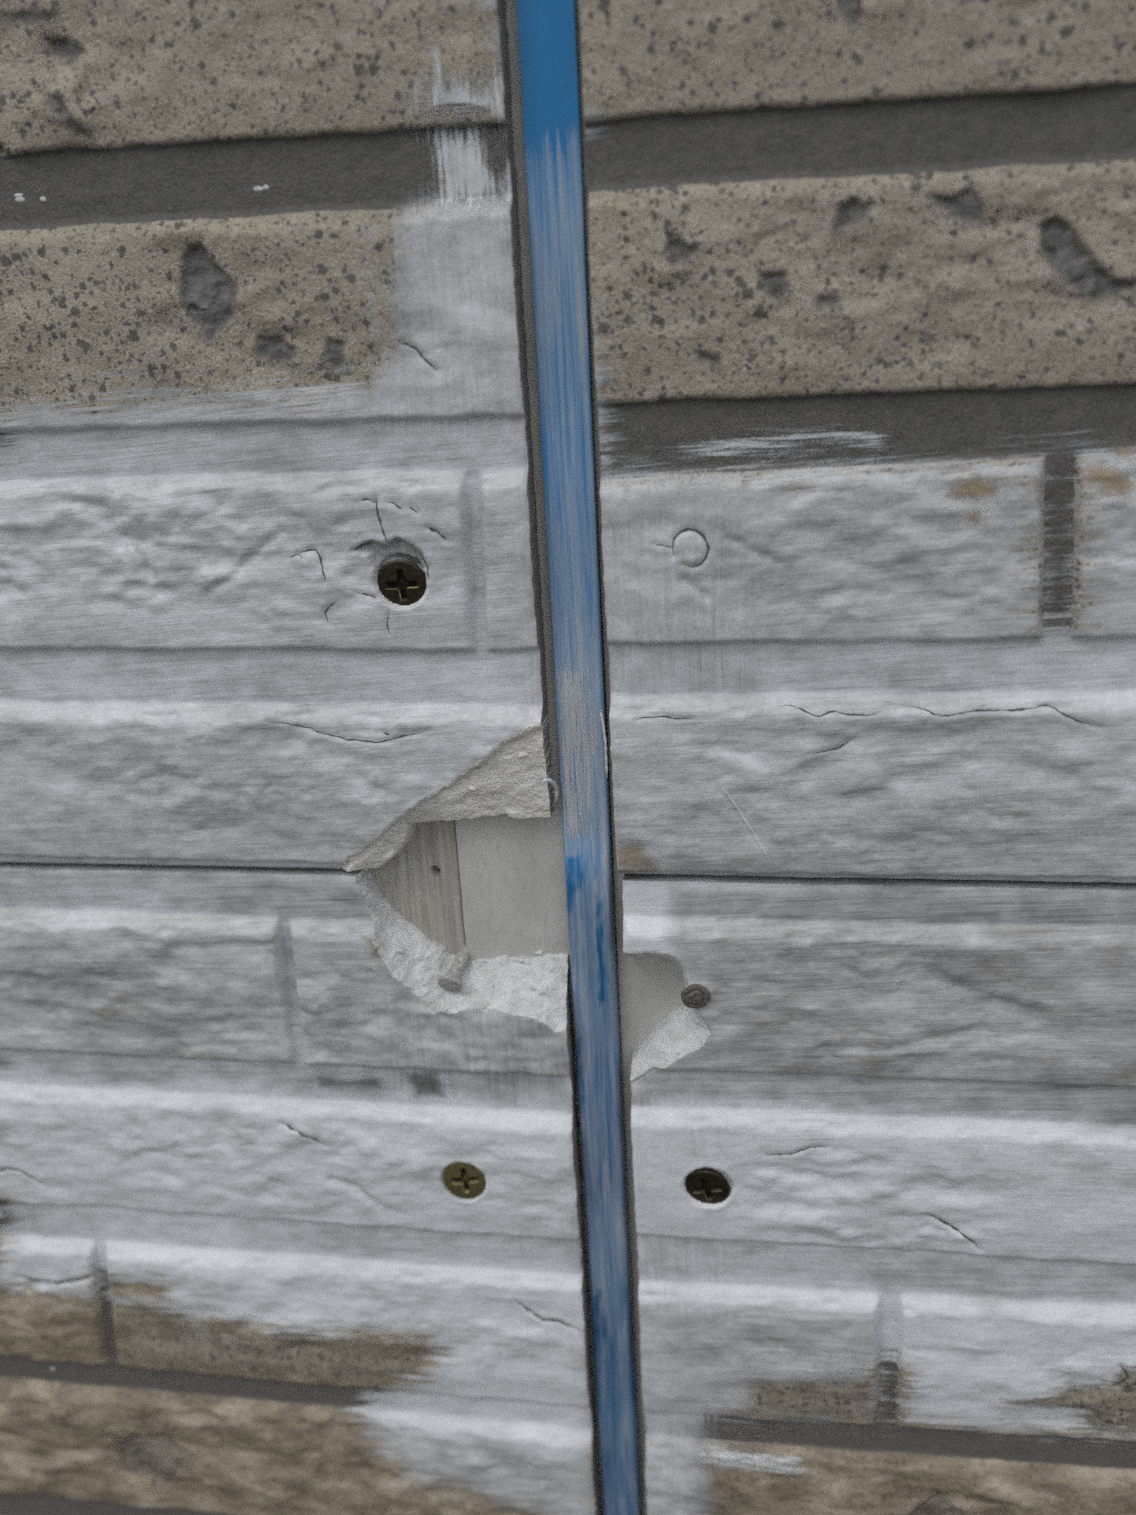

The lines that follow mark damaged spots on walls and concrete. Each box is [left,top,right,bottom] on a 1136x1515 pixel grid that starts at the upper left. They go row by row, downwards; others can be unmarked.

spalling [336,713,572,1033]
spalling [624,952,710,1084]